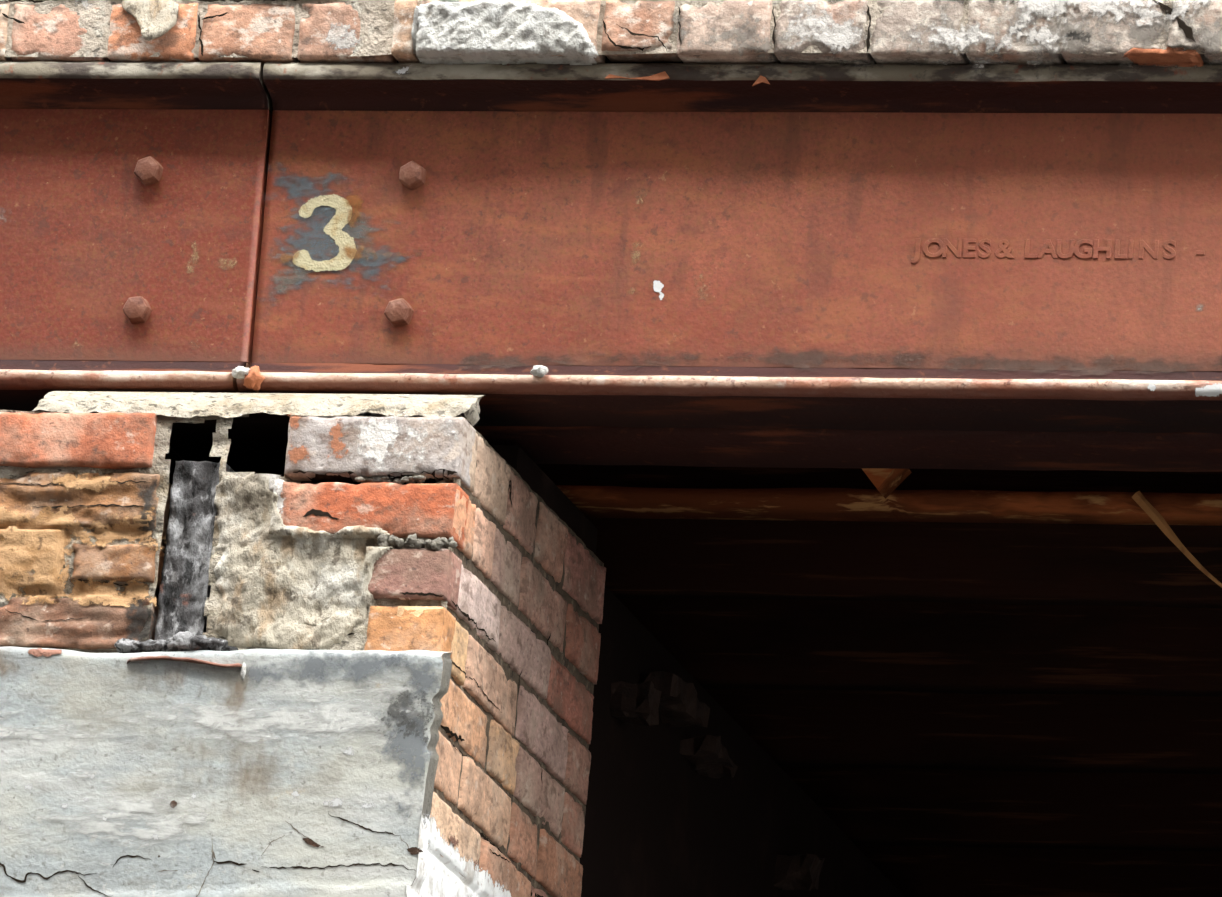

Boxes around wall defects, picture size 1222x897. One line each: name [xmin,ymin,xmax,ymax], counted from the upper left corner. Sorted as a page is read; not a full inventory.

peeling [237,557,274,604]
peeling [289,591,340,626]
crack [0,814,416,897]